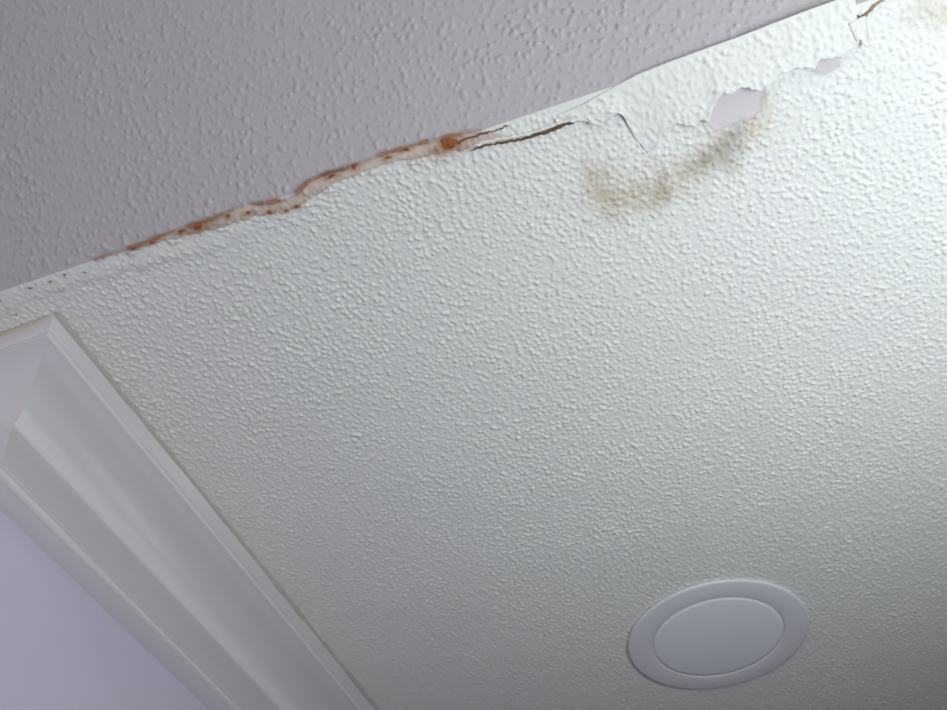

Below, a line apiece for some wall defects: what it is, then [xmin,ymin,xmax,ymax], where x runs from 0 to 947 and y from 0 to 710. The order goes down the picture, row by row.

crack [847,0,891,19]
peeling [555,0,869,153]
corrosion [380,133,460,160]
crack [456,118,579,151]
corrosion [246,163,357,215]
corrosion [128,210,230,250]